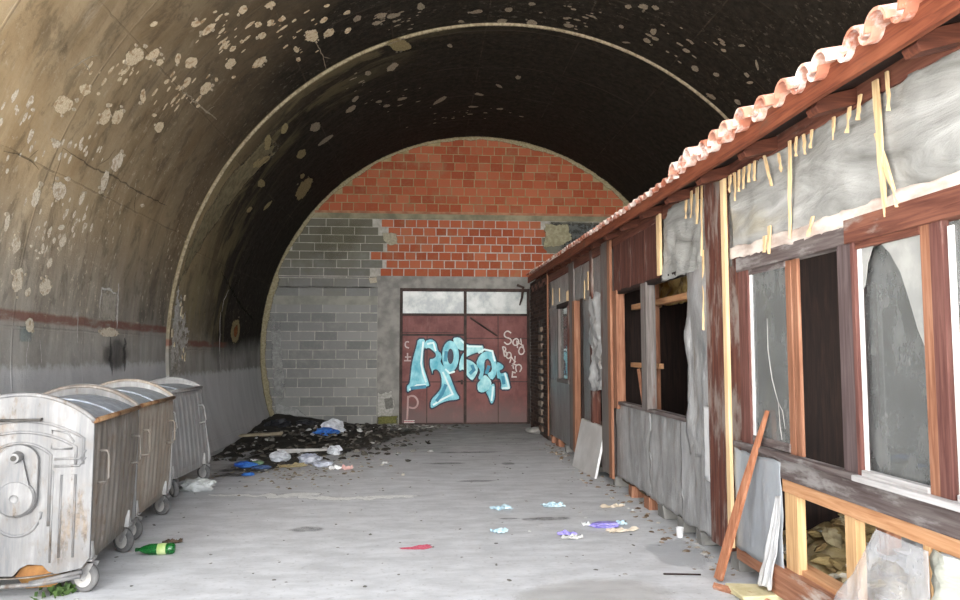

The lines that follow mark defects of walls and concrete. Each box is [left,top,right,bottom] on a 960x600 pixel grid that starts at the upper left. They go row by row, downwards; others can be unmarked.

spalling [372,2,425,72]
peeling [563,6,601,30]
peeling [0,43,218,194]
spalling [310,122,333,146]
spalling [346,71,419,113]
spalling [430,93,523,124]
spalling [295,173,313,201]
spalling [4,176,93,299]
flaking render [170,287,190,372]
leakage [106,337,127,370]